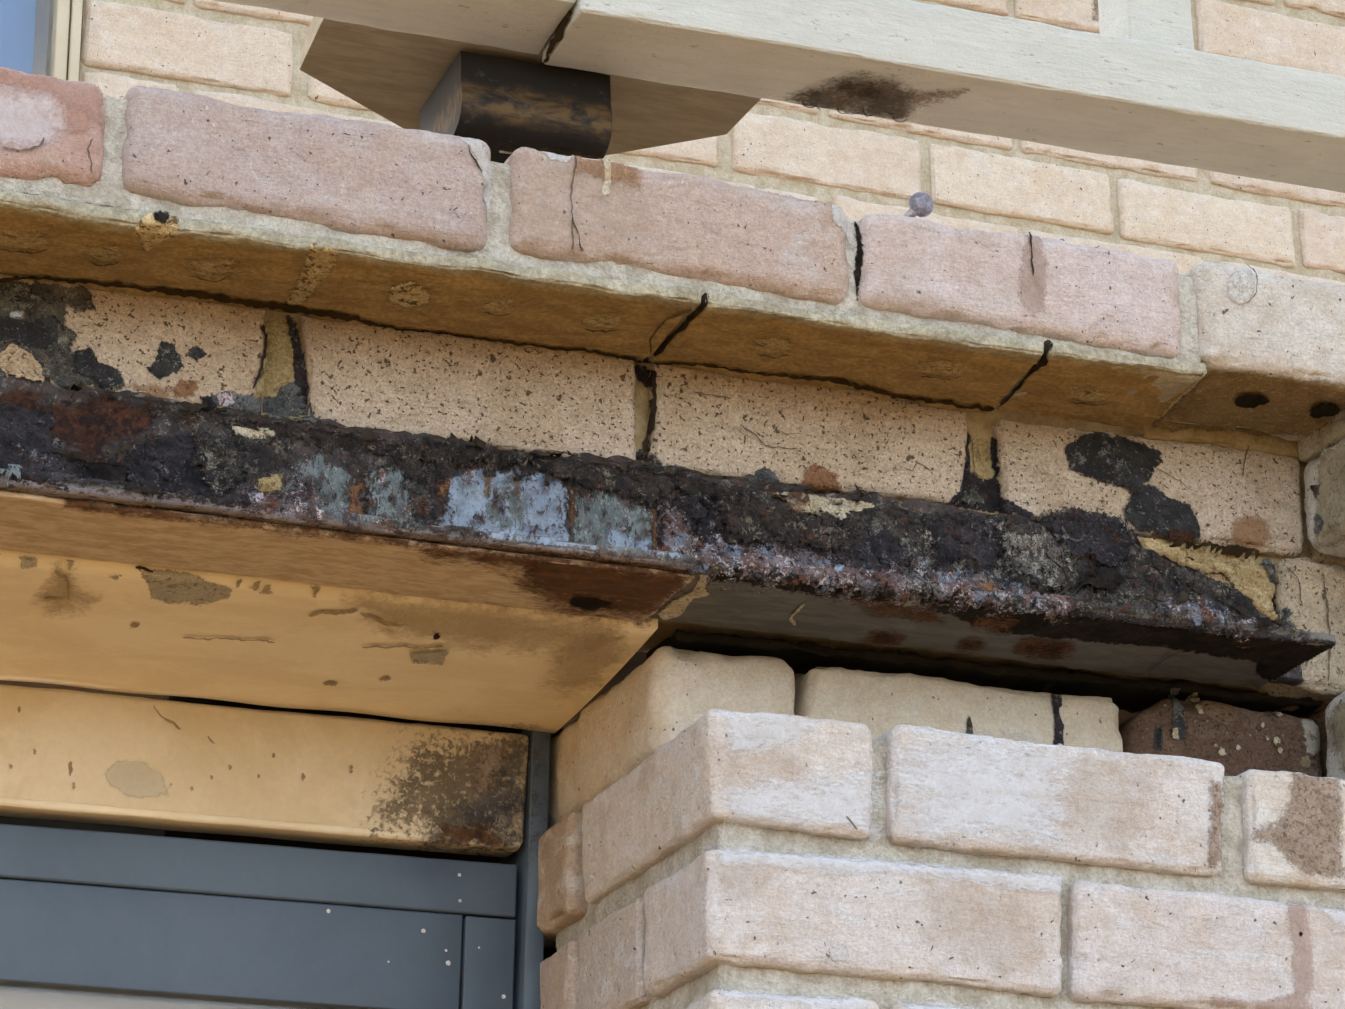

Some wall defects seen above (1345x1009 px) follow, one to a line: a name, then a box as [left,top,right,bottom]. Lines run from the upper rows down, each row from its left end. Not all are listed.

water stain [787,70,969,123]
crack [570,157,581,250]
peeling [0,280,125,392]
peeling [146,341,207,380]
crack [0,276,1053,450]
corrosion [0,380,198,461]
corrosion [0,463,1336,681]
peeling [808,431,1310,648]
mould [367,728,540,856]